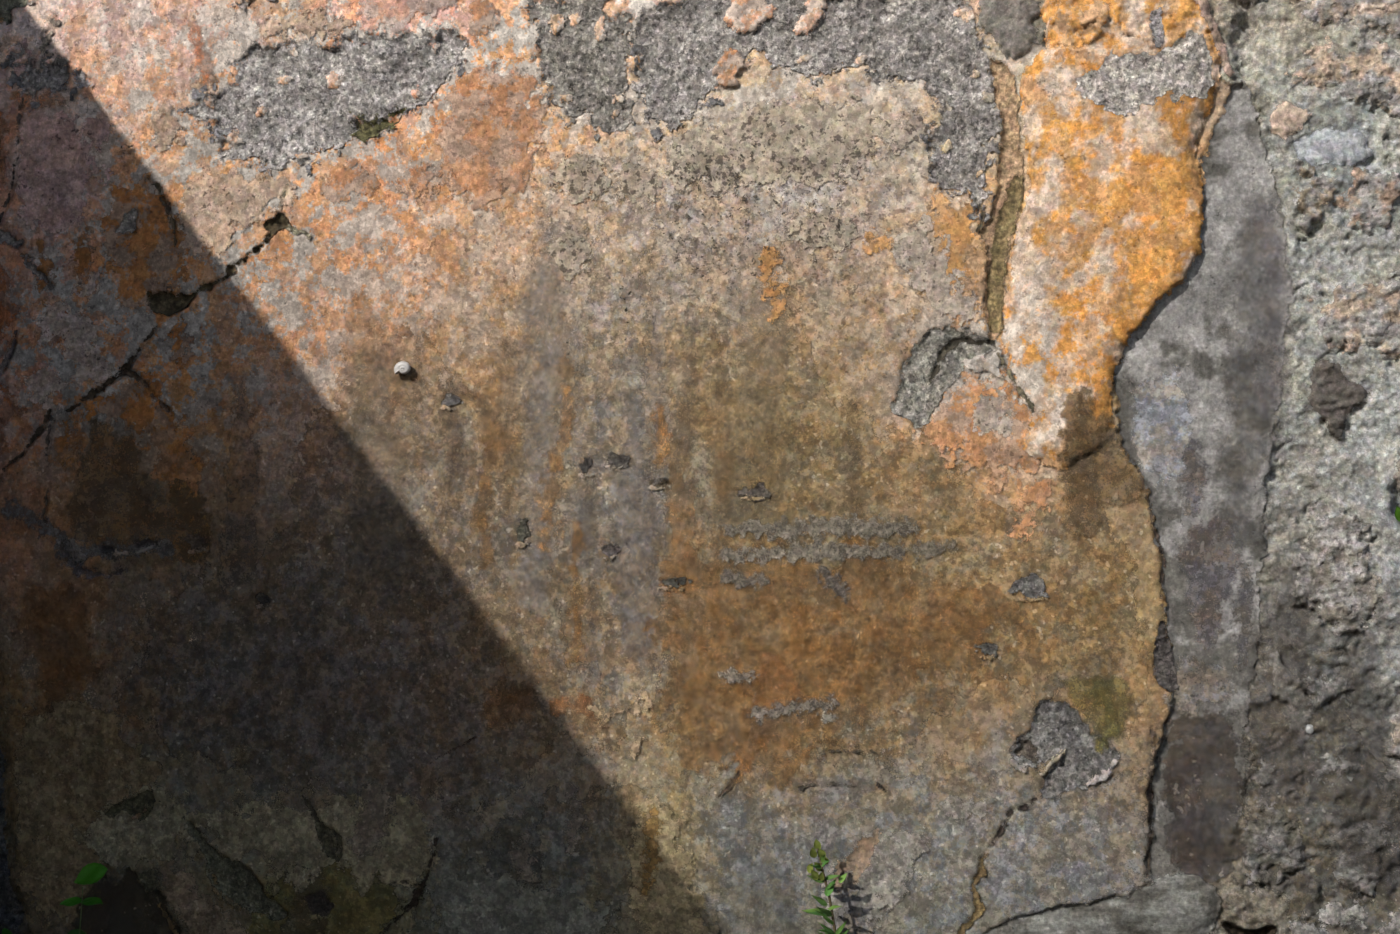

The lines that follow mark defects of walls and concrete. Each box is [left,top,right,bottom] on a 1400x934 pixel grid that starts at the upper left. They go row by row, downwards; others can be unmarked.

crack [0,98,54,290]
crack [0,179,311,472]
flaking render [0,0,1062,542]
flaking render [1009,699,1120,803]
crack [957,797,1037,934]